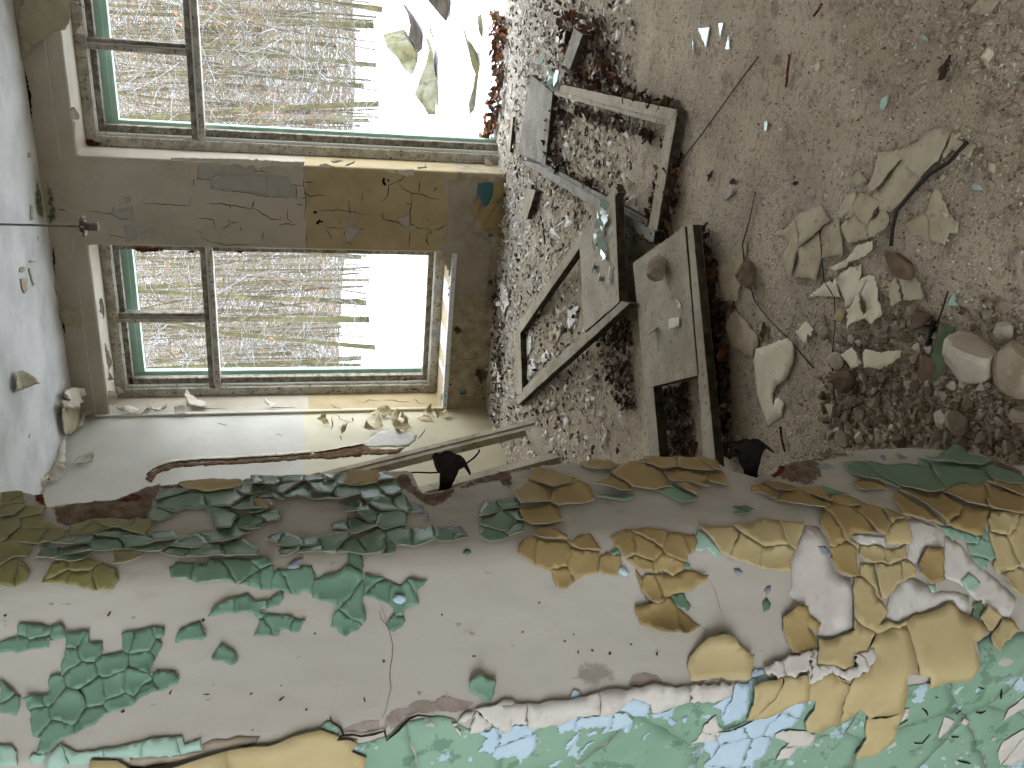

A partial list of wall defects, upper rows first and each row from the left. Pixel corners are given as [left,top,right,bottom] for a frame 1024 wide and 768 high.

peeling [19,260,36,293]
peeling [171,157,305,179]
crack [57,168,444,248]
flaking render [440,177,505,297]
peeling [105,343,206,416]
peeling [0,387,1024,768]